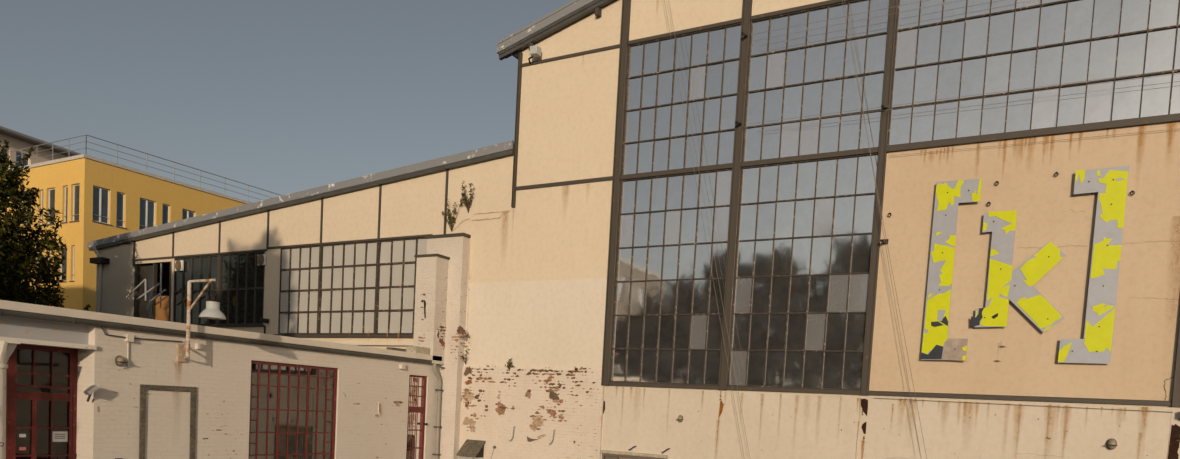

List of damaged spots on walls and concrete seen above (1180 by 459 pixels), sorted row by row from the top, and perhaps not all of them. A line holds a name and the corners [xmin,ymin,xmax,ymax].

peeling [418,274,599,459]
corrosion [857,398,868,451]
corrosion [1168,424,1180,459]